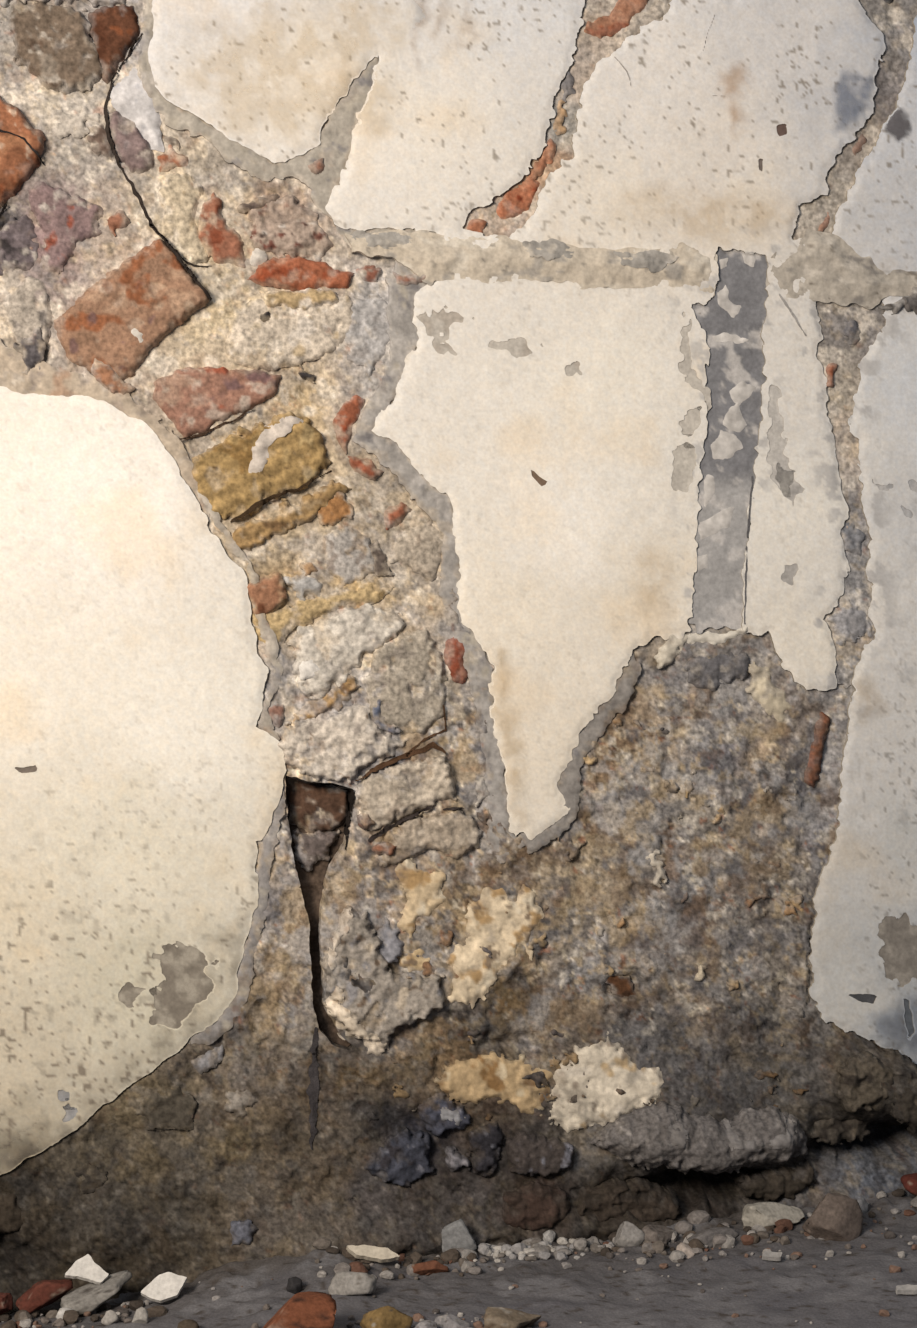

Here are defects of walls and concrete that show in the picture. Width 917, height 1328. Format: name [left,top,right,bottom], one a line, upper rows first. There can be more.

crack [0,129,45,166]
crack [104,33,212,301]
spalling [463,0,671,237]
peeling [713,285,749,344]
peeling [719,252,756,269]
spalling [777,124,787,136]
spalling [791,0,917,240]
spalling [0,0,528,898]
spalling [0,300,917,1314]
crack [285,705,463,1150]